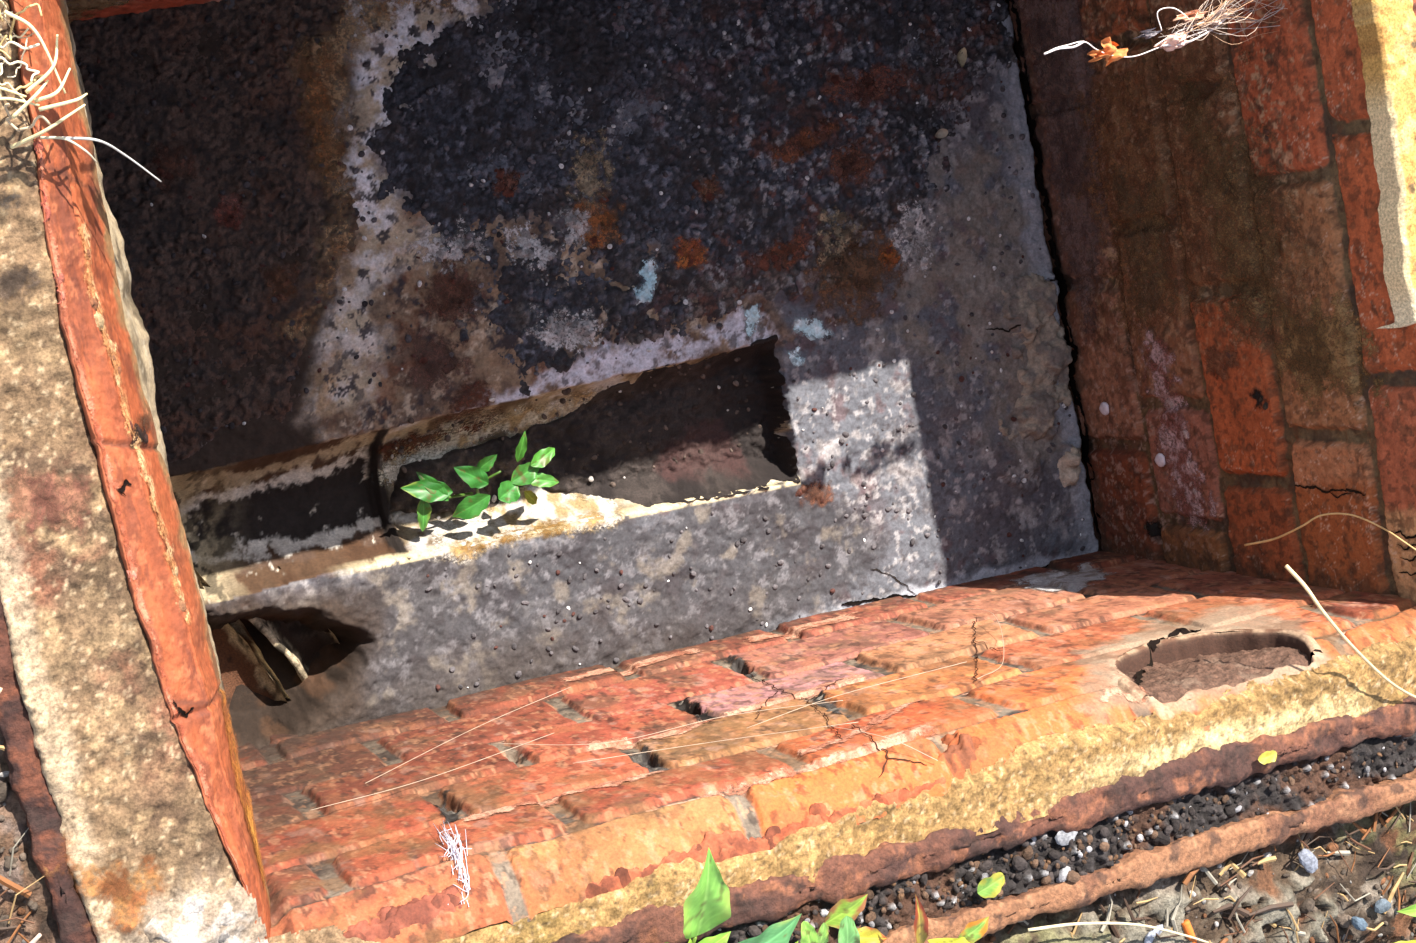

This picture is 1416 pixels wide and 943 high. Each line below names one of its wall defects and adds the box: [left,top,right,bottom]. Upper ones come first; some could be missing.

damp [281,0,458,339]
corrosion [573,191,625,249]
corrosion [673,236,709,269]
corrosion [745,211,911,327]
crack [1294,484,1365,499]
crack [1391,530,1416,576]
crack [972,616,1002,682]
crack [750,674,926,777]